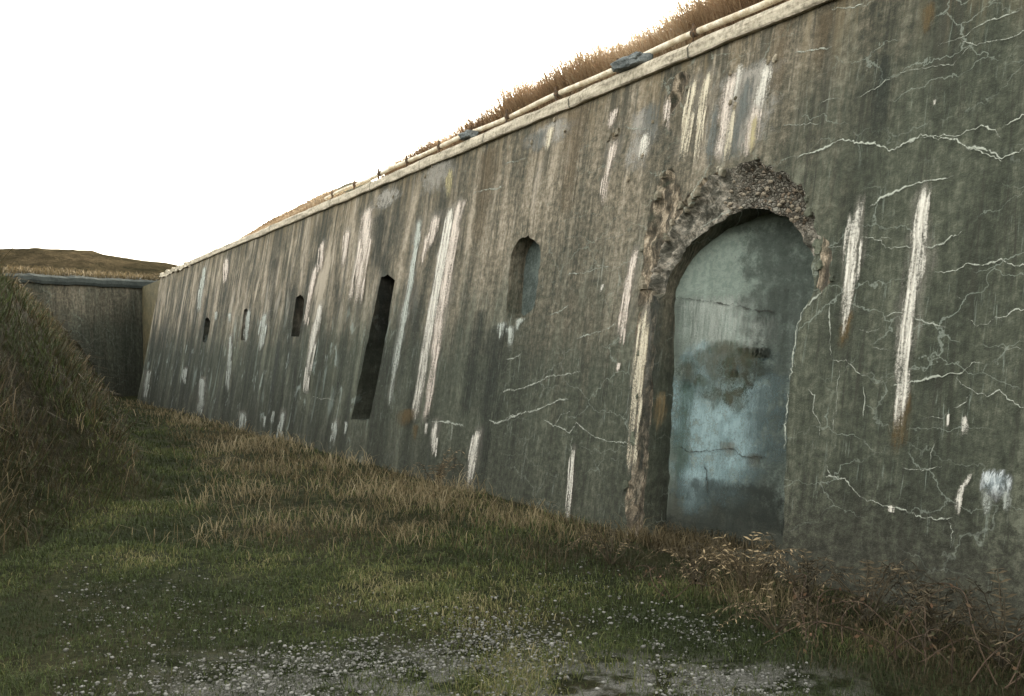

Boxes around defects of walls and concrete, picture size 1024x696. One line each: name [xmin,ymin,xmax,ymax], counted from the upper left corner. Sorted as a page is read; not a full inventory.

leakage [663,73,712,161]
crack [785,98,1024,161]
crack [872,178,946,205]
leakage [303,241,324,392]
leakage [341,208,372,301]
leakage [389,168,465,457]
spalling [622,54,835,536]
crack [784,293,865,446]
leakage [842,208,863,331]
leakage [894,189,930,424]
crack [865,235,1024,273]
crack [894,362,1024,418]